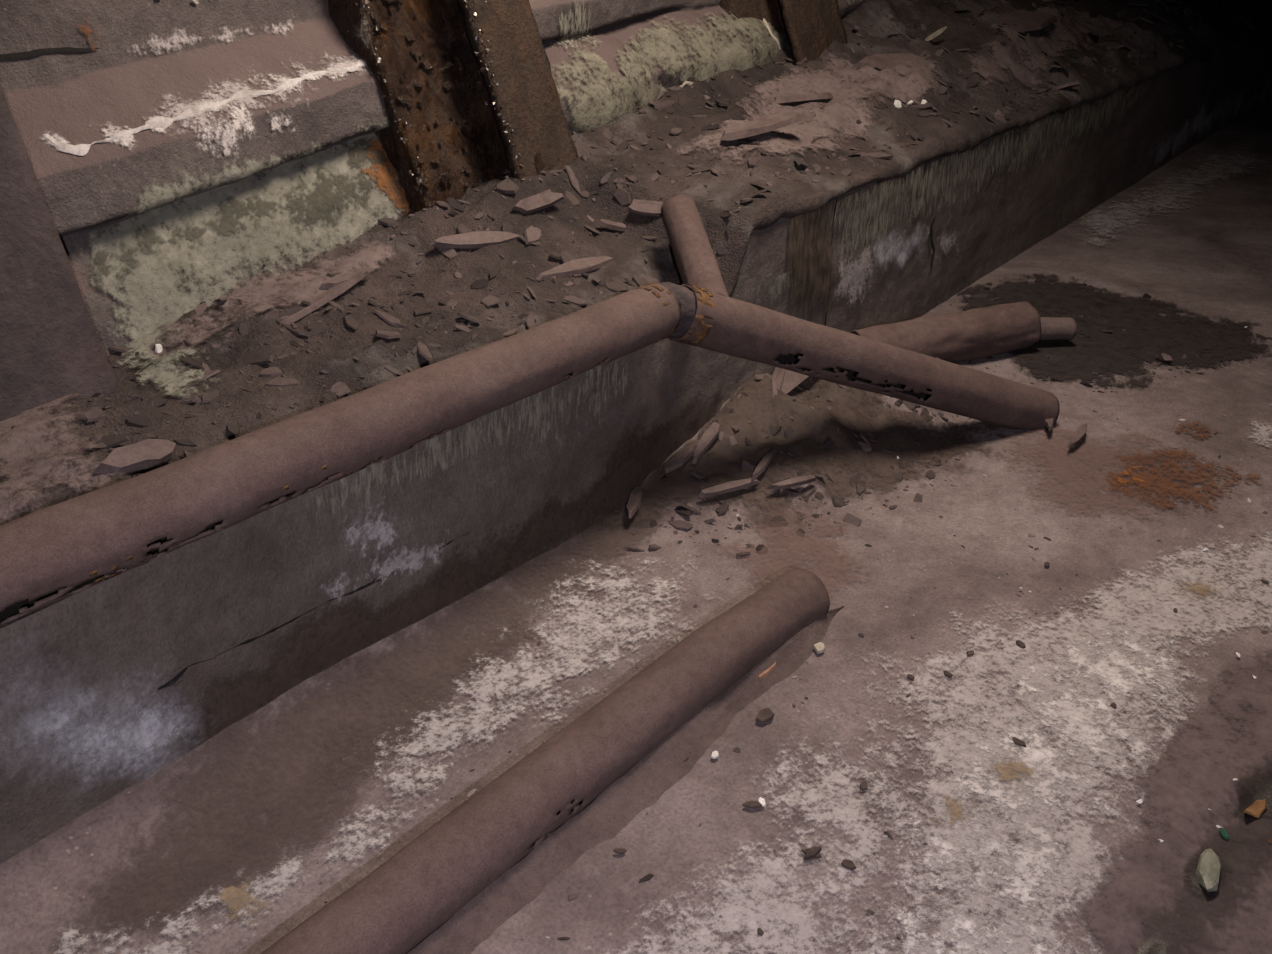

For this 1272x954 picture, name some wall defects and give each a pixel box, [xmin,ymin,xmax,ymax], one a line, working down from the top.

water stain [44,53,405,398]
water stain [955,274,1271,389]
crack [158,569,399,690]
water stain [0,359,1005,954]
water stain [606,532,1272,954]